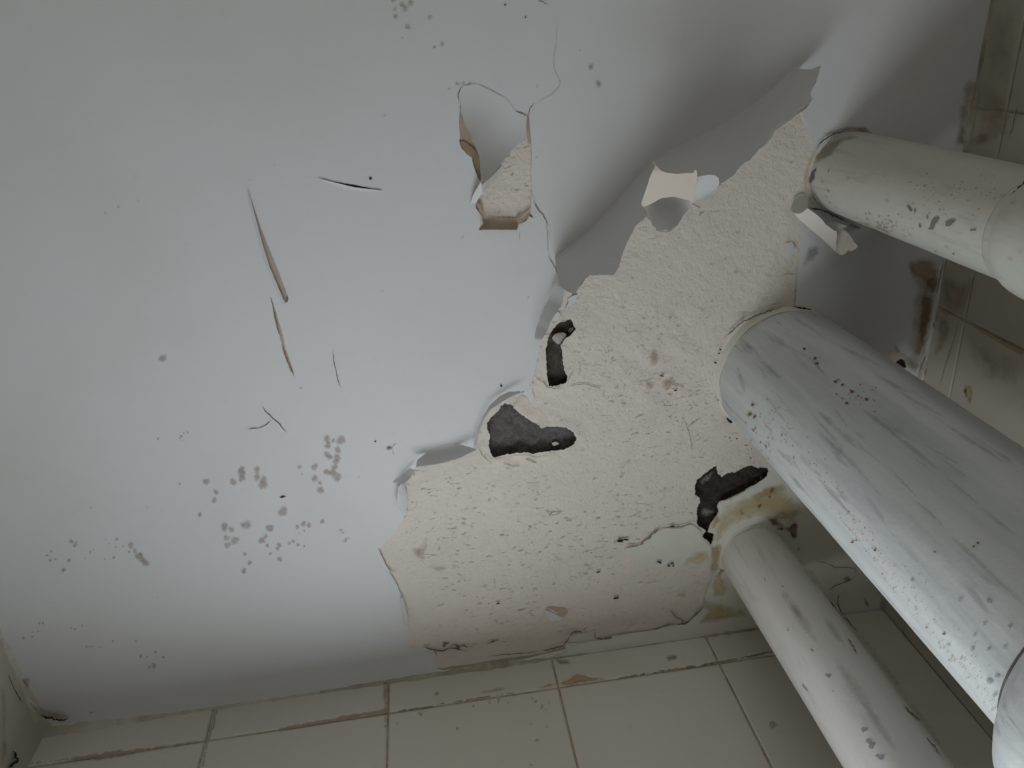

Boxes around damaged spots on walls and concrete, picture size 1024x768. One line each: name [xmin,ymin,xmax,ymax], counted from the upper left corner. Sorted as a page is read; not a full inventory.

peeling [379,66,858,668]